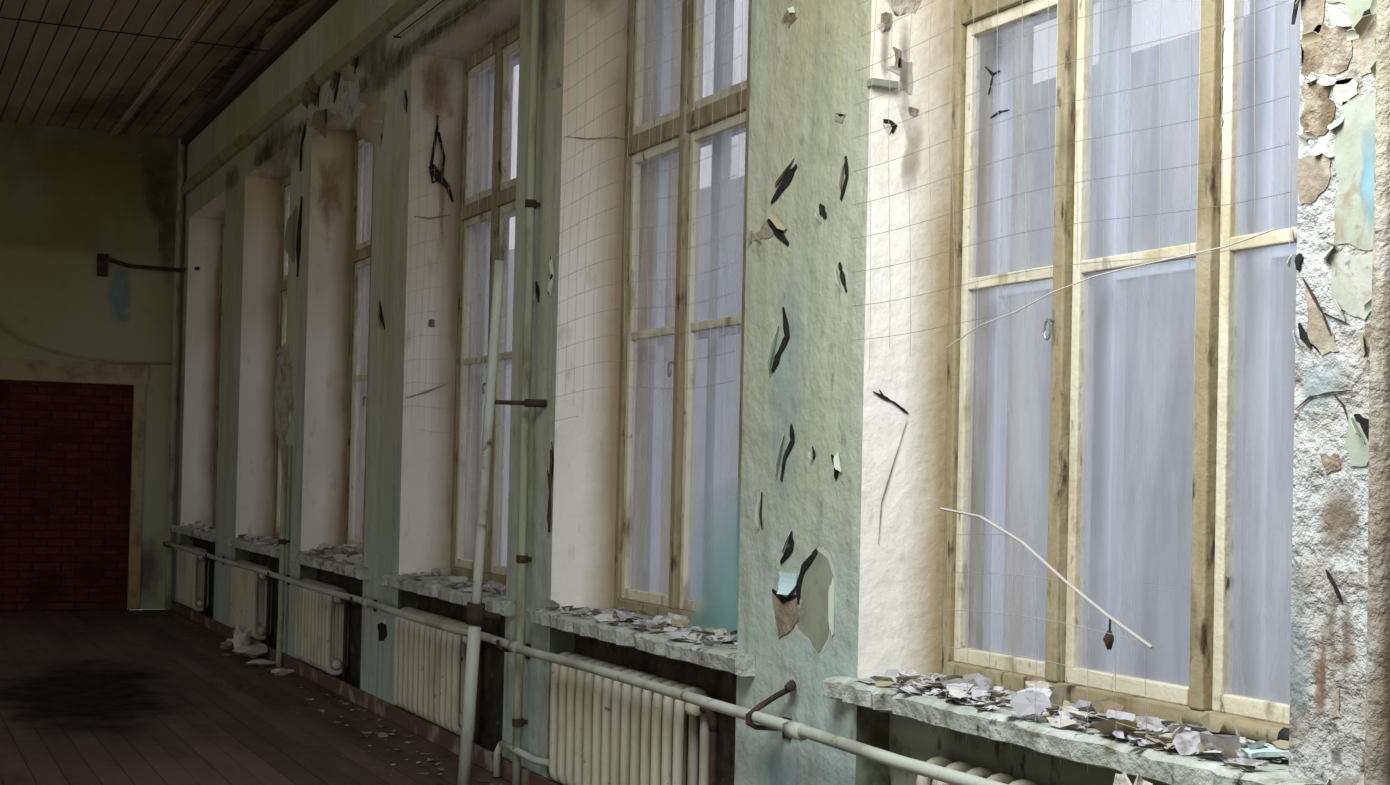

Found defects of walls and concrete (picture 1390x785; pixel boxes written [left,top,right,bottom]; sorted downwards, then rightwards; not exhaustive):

peeling [289,55,386,171]
peeling [746,157,797,246]
peeling [815,156,848,223]
peeling [1287,0,1377,367]
peeling [834,262,847,292]
peeling [767,306,790,376]
peeling [1349,414,1369,443]
peeling [1320,454,1342,475]
flaking render [772,530,837,656]
flaking render [1326,773,1364,785]